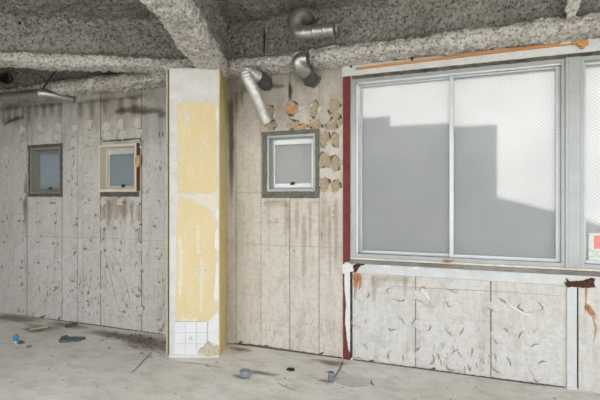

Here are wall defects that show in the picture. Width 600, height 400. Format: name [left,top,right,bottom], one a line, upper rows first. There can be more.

peeling [285,98,343,194]
peeling [176,102,219,356]
rust [353,263,365,289]
rust [564,278,597,334]